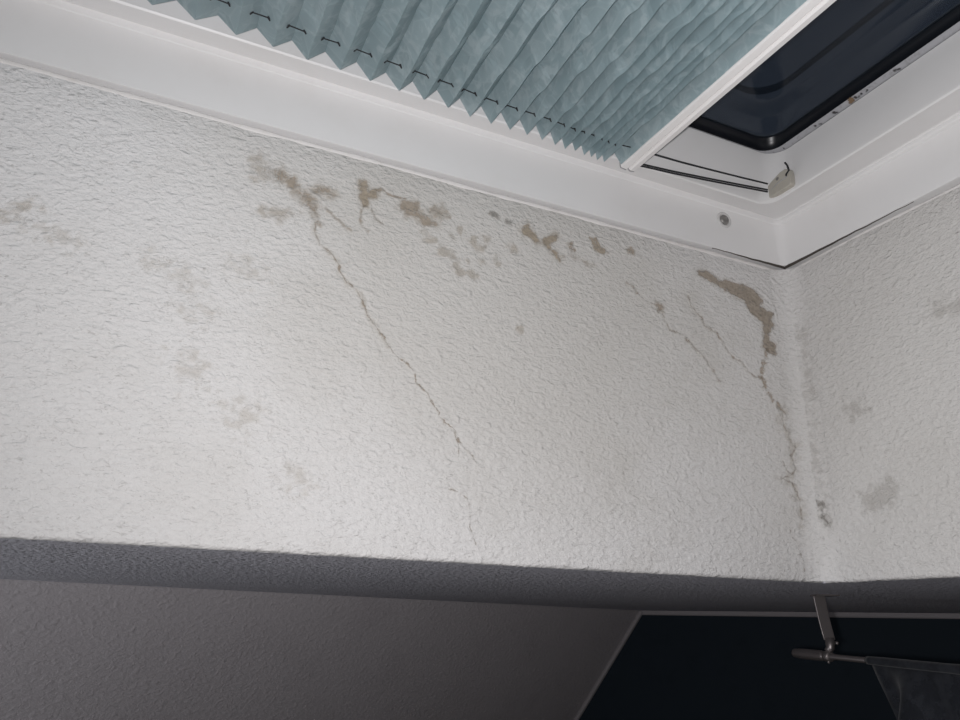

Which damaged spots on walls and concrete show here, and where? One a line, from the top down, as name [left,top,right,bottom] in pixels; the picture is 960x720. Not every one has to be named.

leakage [359,181,437,226]
leakage [522,225,560,260]
leakage [589,237,605,254]
leakage [698,271,782,410]